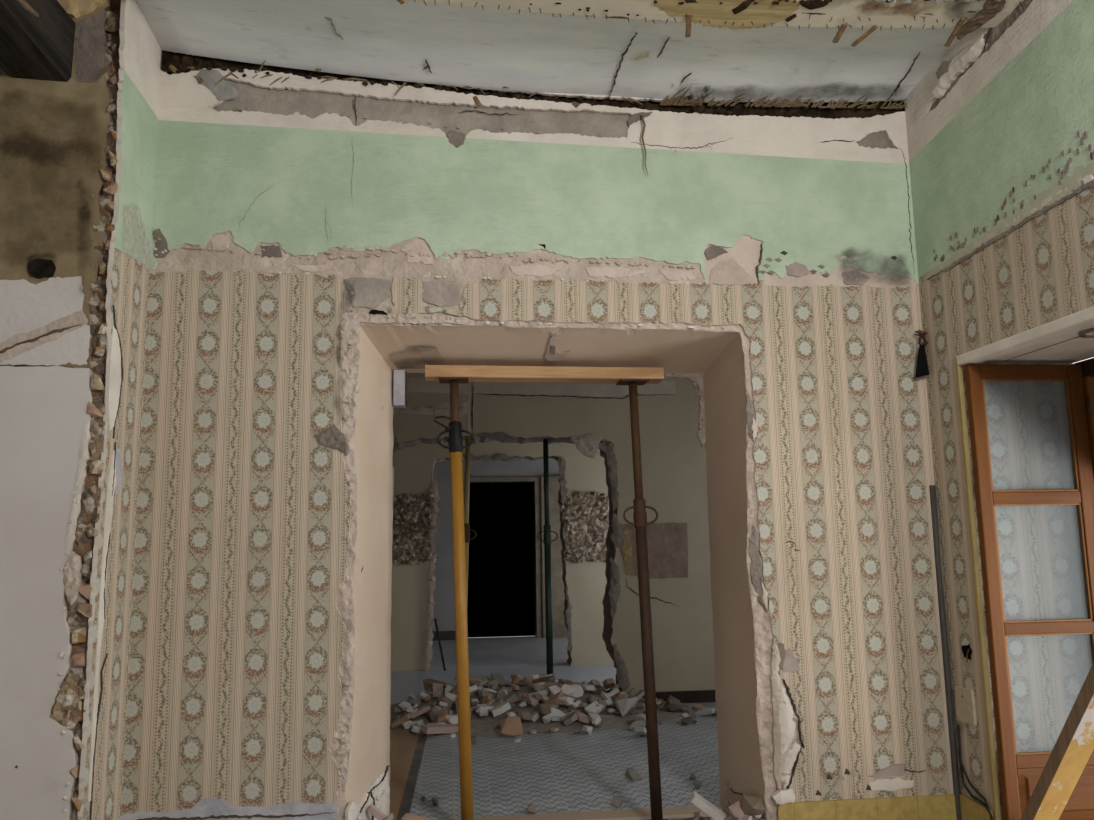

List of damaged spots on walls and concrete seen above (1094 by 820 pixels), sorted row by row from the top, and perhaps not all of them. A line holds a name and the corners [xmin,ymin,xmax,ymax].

peeling [193,66,664,148]
crack [608,33,637,99]
crack [632,138,732,149]
peeling [654,0,842,30]
crack [889,52,920,100]
peeling [924,0,1033,111]
crack [902,151,915,275]
flaking render [49,10,123,820]
flaking render [121,131,1094,820]